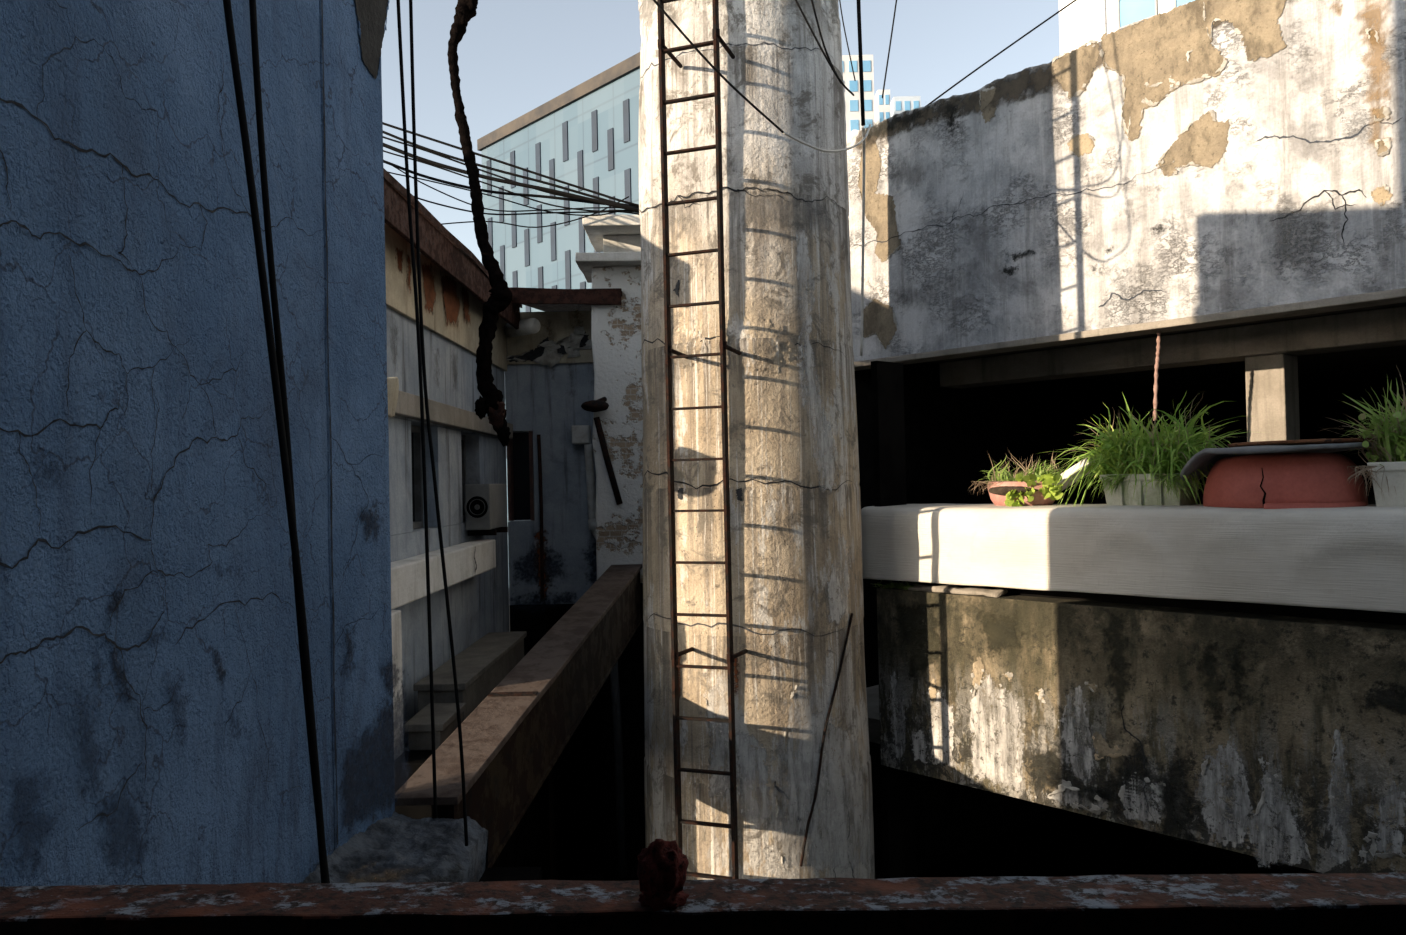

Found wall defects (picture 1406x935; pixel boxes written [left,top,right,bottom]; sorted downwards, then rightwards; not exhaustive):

spalling [355,0,389,79]
leakage [855,61,1062,149]
peeling [1052,0,1287,141]
peeling [1156,110,1230,176]
crack [1257,117,1403,143]
leakage [1360,3,1389,142]
crack [640,186,844,213]
peeling [857,143,901,262]
crack [1272,189,1366,246]
crack [0,0,380,844]
leakage [897,601,942,678]
leakage [1026,742,1199,842]